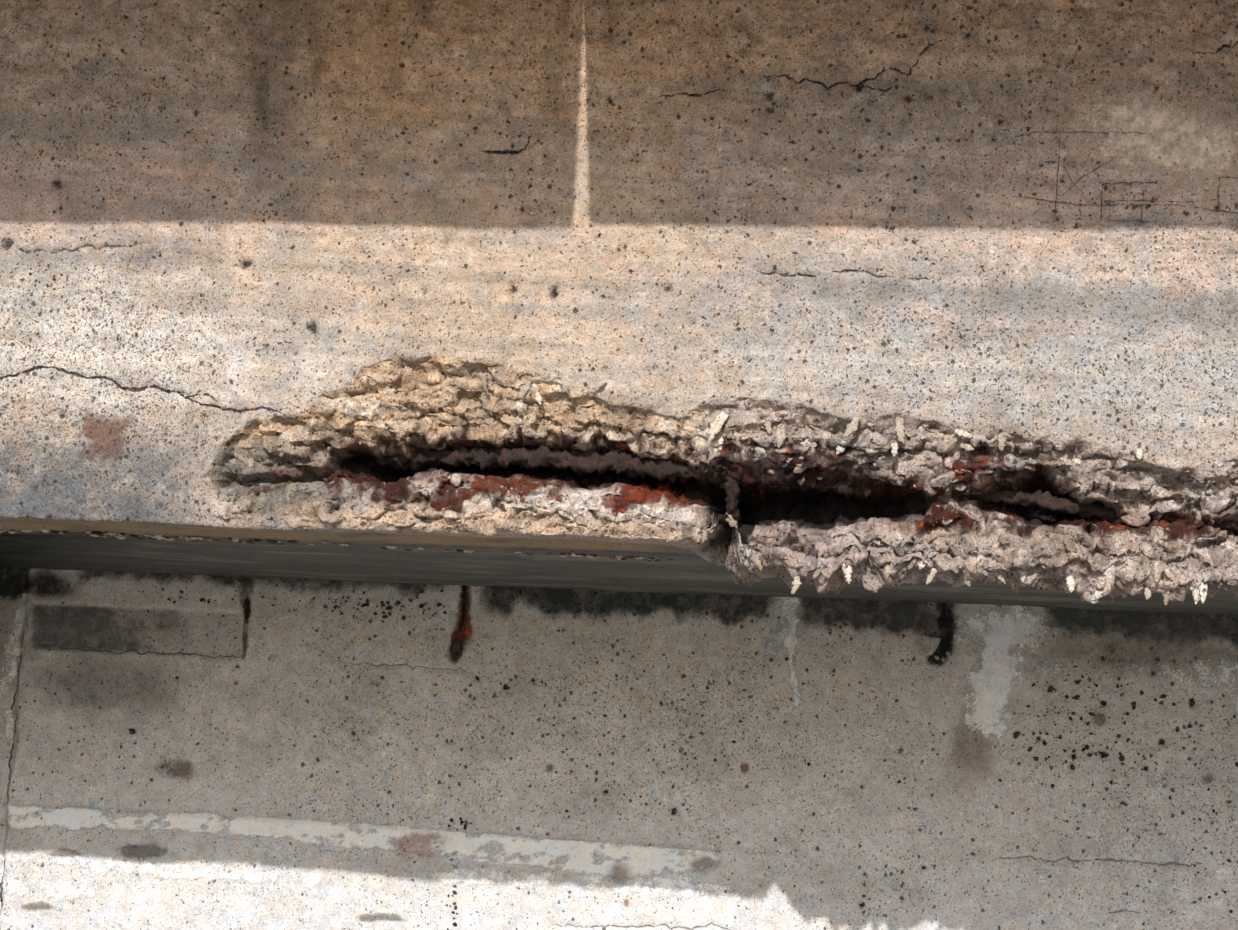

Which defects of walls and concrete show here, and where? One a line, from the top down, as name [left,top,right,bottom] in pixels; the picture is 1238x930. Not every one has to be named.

crack [762,40,943,92]
crack [1195,41,1238,54]
crack [659,89,721,97]
crack [482,134,532,154]
crack [2,243,141,253]
crack [757,269,928,279]
crack [0,366,288,418]
spalling [201,351,1238,606]
rust [450,585,472,663]
leakage [482,586,931,706]
leakage [954,606,1238,738]